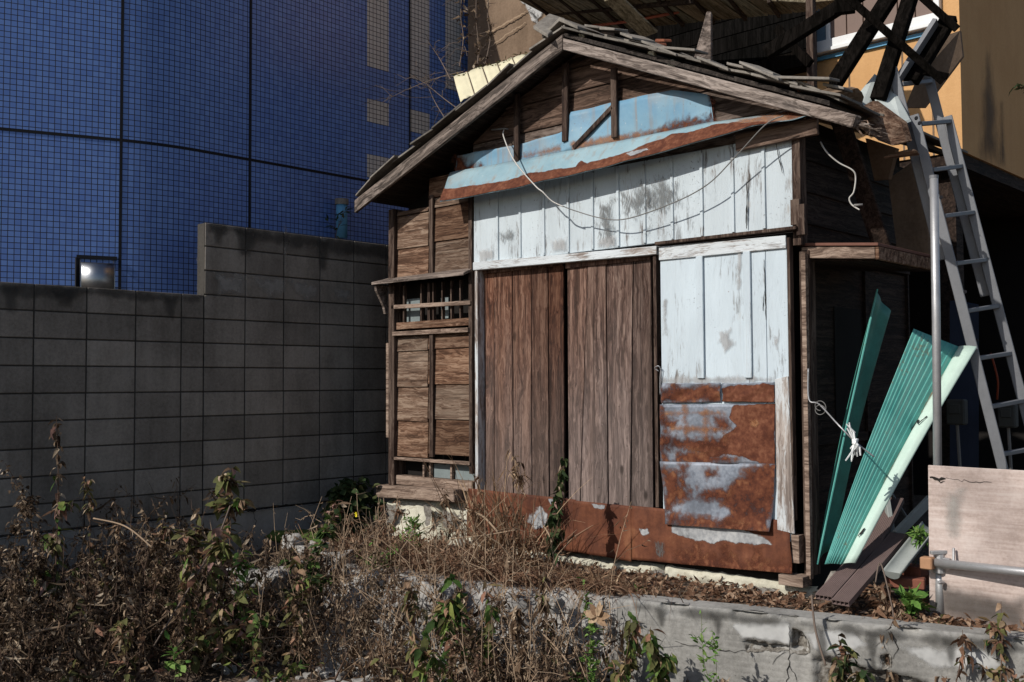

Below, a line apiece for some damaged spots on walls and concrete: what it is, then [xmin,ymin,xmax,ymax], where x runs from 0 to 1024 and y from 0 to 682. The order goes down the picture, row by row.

corrosion [440,97,805,200]
water stain [595,176,676,242]
water stain [211,224,389,267]
corrosion [660,382,775,532]
crack [772,629,797,682]